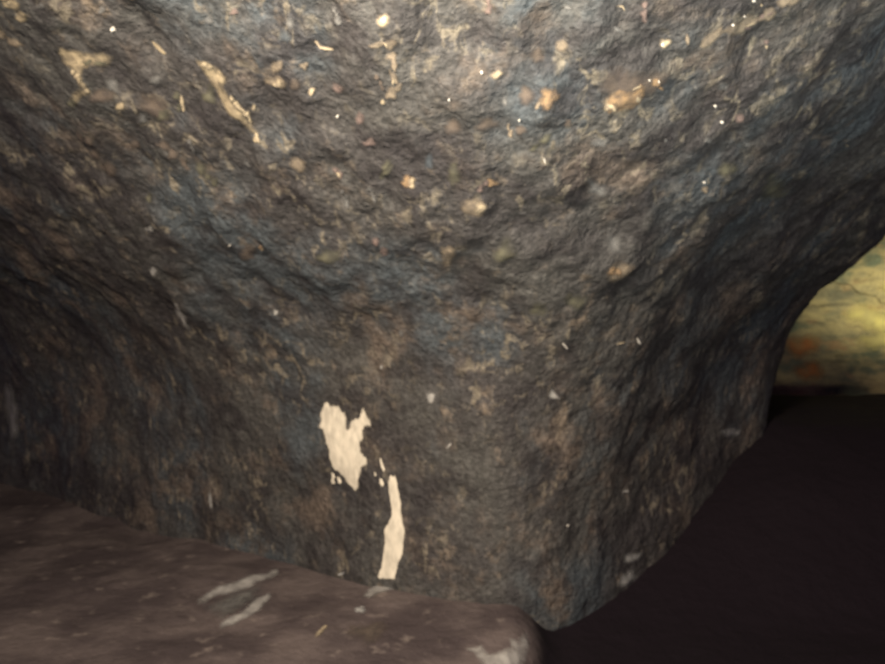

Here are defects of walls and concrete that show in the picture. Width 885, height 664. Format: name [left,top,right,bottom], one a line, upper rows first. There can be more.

peeling [320,402,371,490]
peeling [374,458,405,579]